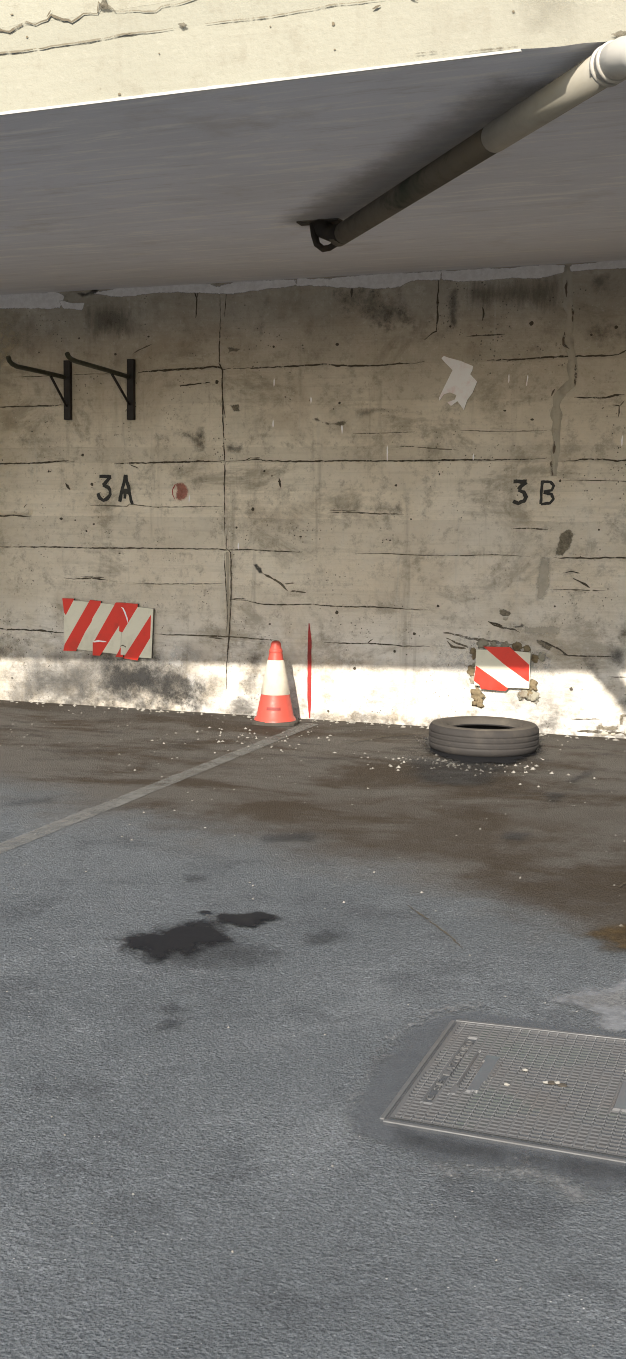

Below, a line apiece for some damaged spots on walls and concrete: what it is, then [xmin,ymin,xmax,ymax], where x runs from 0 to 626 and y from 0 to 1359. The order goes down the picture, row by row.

crack [0,0,375,54]
water stain [121,668,149,684]